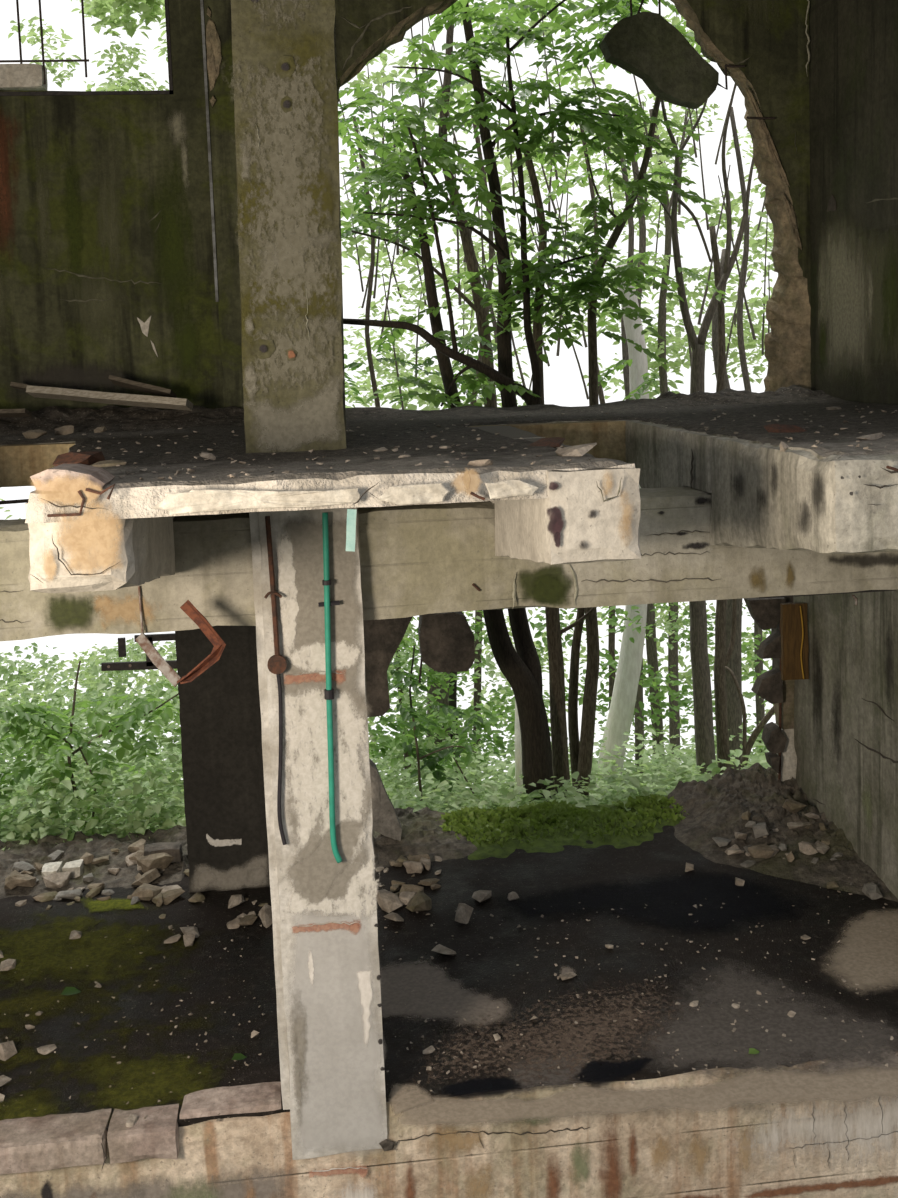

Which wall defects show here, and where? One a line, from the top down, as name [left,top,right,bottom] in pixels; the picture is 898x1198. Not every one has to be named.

spalling [744,85,802,250]
water stain [799,477,823,531]
crack [396,1127,590,1148]
crack [792,1097,898,1169]
rust [41,1182,53,1198]
rust [406,1170,415,1198]
rust [547,1167,560,1198]
rust [600,1134,637,1198]